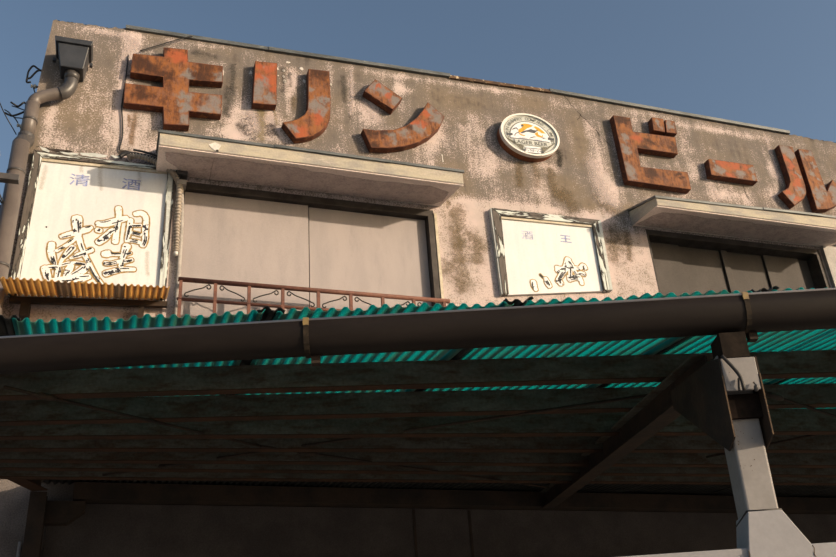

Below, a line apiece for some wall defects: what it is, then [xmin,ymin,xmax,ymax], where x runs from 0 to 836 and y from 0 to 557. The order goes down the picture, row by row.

damp [166,152,483,293]